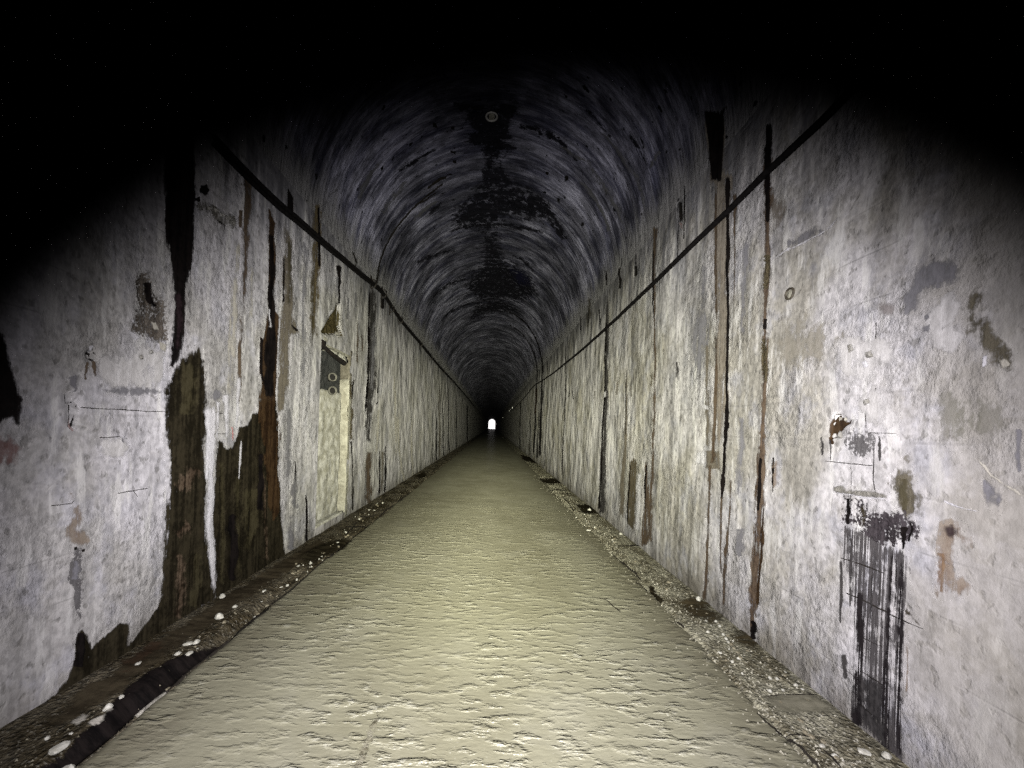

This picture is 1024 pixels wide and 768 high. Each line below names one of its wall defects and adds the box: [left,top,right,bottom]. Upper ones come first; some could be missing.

peeling [64,272,168,431]
leakage [47,109,350,725]
leakage [514,223,564,240]
leakage [676,110,749,623]
rust [748,124,776,639]
leakage [839,414,920,760]